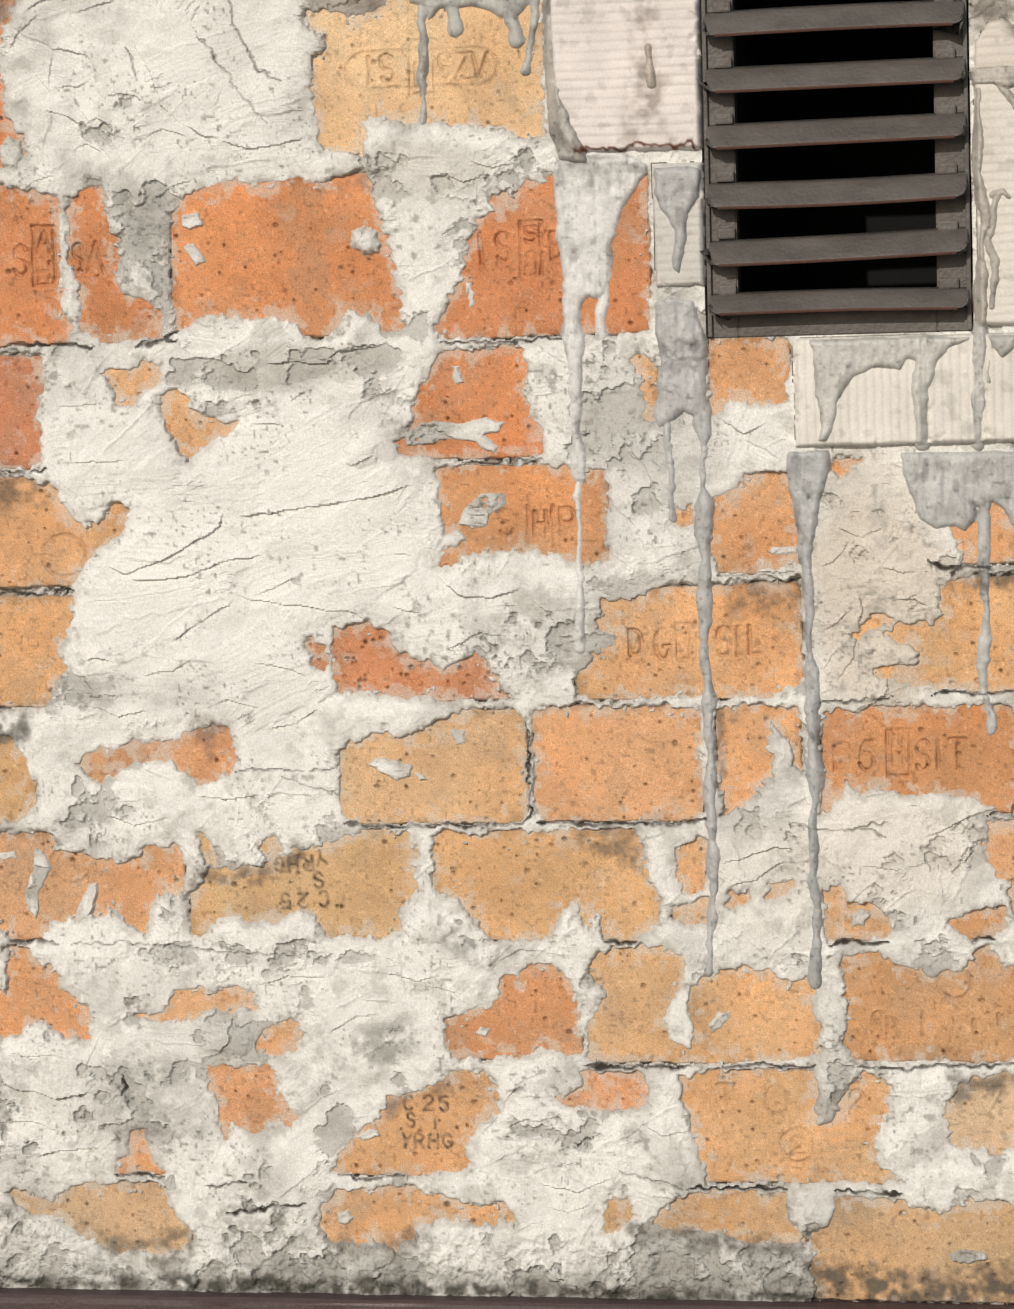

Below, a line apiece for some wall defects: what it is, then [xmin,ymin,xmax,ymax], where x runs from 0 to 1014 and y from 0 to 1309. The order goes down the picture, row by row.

spalling [0,74,27,168]
damp [416,5,429,125]
spalling [306,0,546,157]
damp [503,0,540,76]
spalling [581,170,656,336]
spalling [0,173,406,710]
spalling [395,175,610,567]
damp [663,423,677,523]
spalling [0,471,1014,1304]
damp [692,382,721,977]
damp [801,568,826,990]
damp [976,507,998,736]